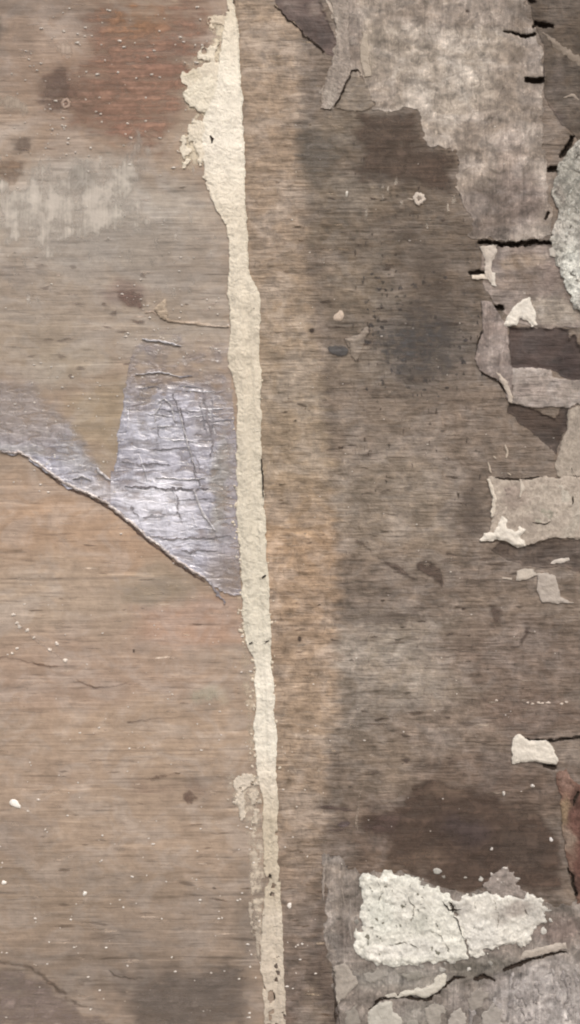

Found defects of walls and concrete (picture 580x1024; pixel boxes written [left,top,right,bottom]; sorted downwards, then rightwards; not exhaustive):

damp [356,113,454,189]
peeling [407,192,426,206]
crack [477,211,552,248]
peeling [471,244,497,287]
peeling [504,297,538,327]
peeling [502,568,574,604]
peeling [511,734,559,765]
damp [363,780,562,893]
peeling [464,867,535,899]
crack [389,884,499,950]
peeling [520,906,567,960]
peeling [333,947,502,1024]